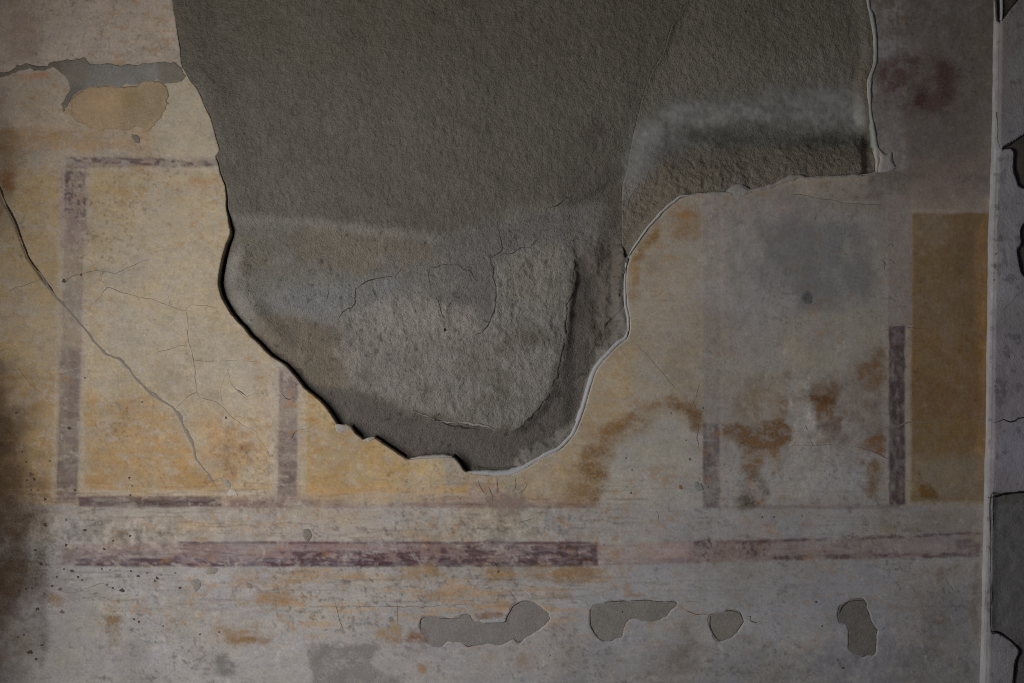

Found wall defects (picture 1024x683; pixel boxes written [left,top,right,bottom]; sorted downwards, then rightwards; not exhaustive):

spalling [1003,135,1024,188]
crack [0,186,294,488]
crack [327,269,401,317]
crack [428,221,537,335]
flaking render [172,0,896,522]
flaking render [988,491,1024,683]